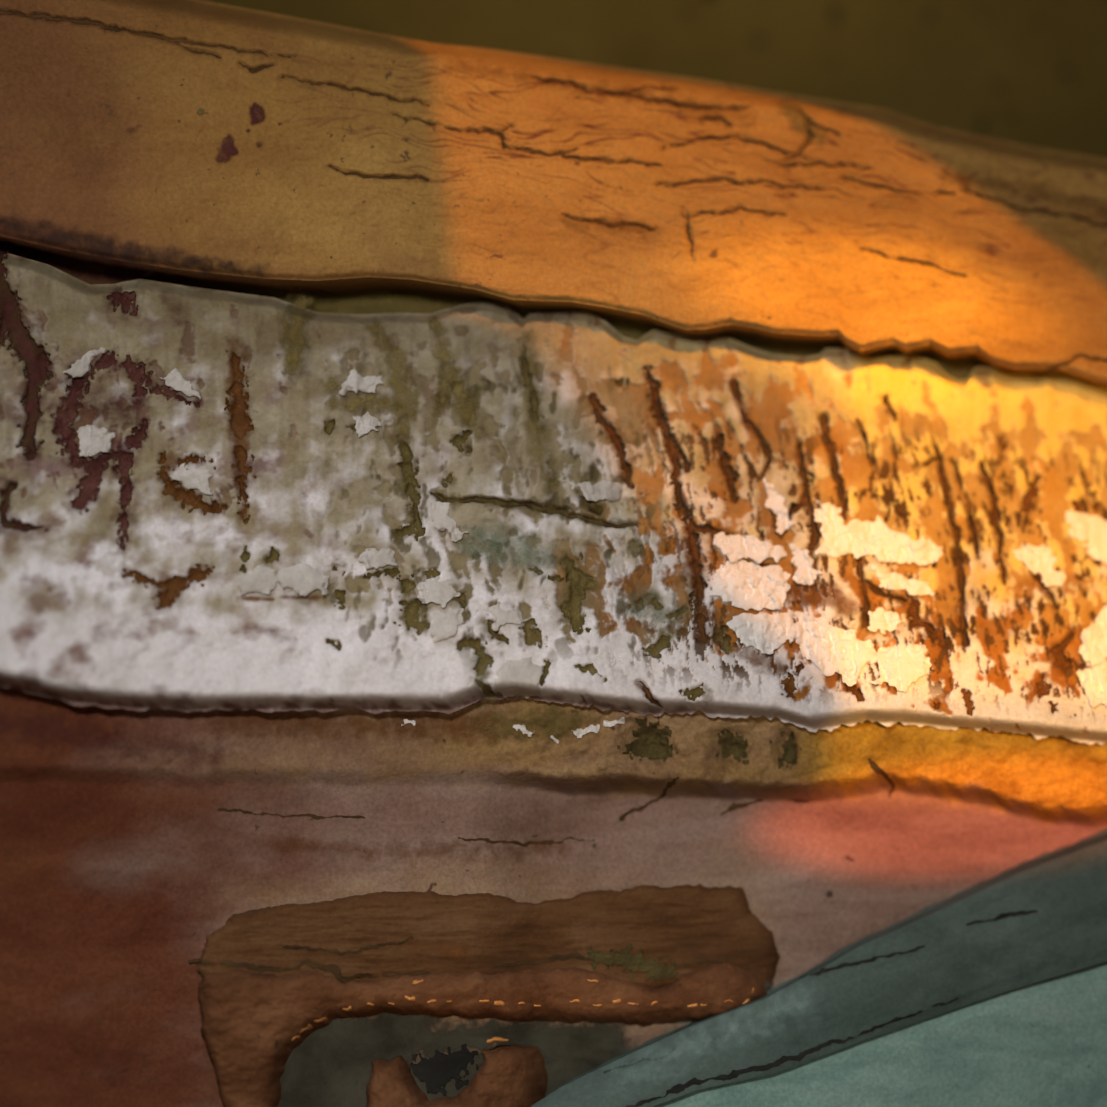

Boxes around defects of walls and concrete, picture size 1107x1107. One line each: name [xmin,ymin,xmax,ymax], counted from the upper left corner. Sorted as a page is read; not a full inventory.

crack [0,10,1107,258]
crack [860,249,966,278]
crack [0,241,53,532]
spalling [50,347,202,550]
peeling [358,435,551,698]
rust [786,583,854,613]
peeling [709,478,945,701]
peeling [1012,543,1089,587]
rust [740,647,785,673]
peeling [1049,604,1107,707]
crack [800,945,925,977]
crack [626,997,958,1107]